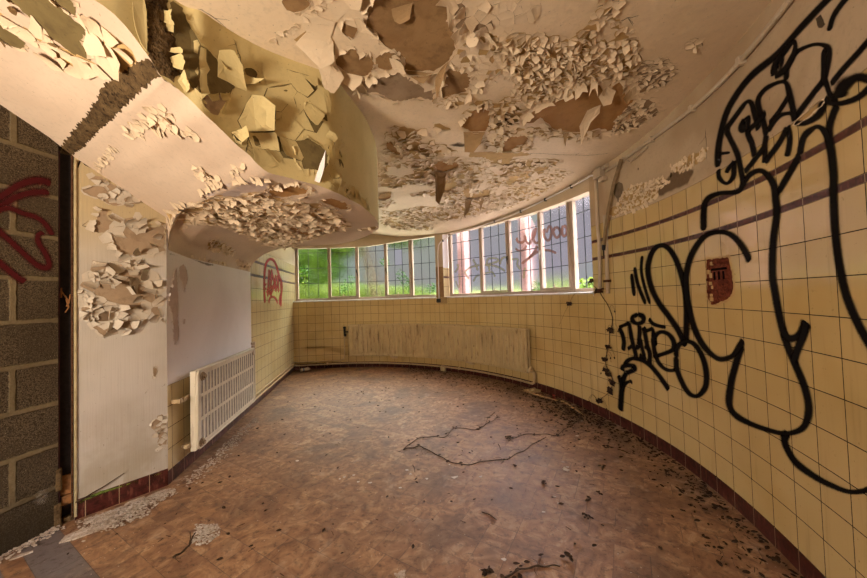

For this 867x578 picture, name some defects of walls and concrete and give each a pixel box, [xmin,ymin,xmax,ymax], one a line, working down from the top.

peeling [0,0,681,345]
peeling [609,147,709,217]